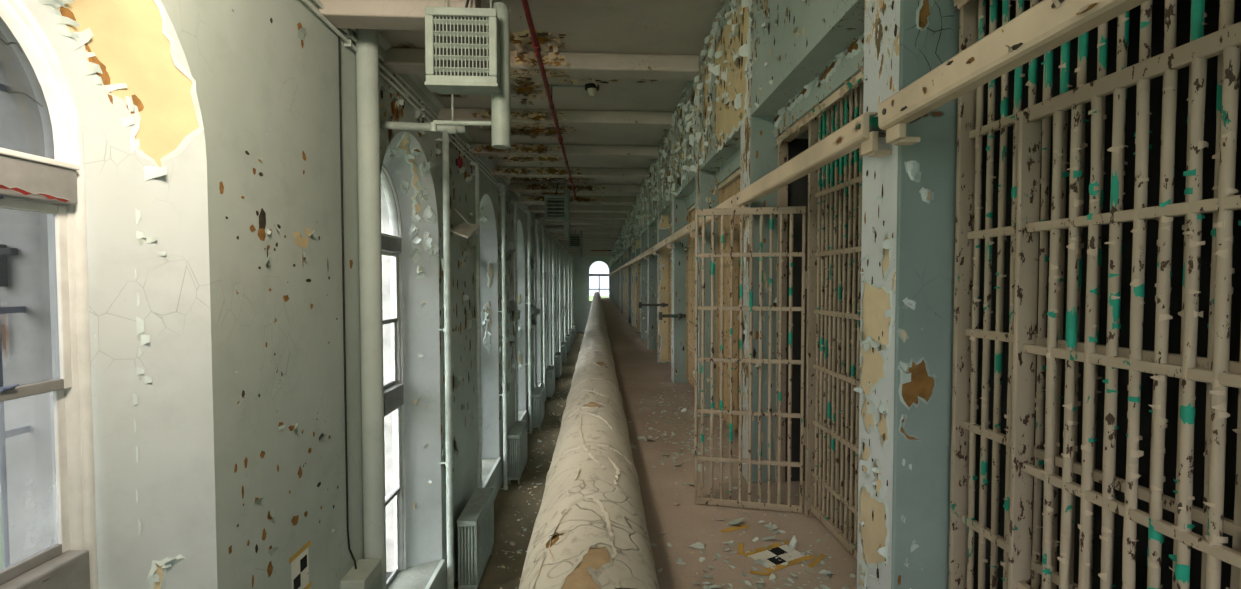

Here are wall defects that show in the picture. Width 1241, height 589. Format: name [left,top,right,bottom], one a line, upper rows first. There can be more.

flaking render [39,0,204,181]
peeling [760,33,868,147]
peeling [872,0,897,37]
crack [907,0,954,71]
peeling [379,29,618,490]
flaking render [610,0,808,461]
peeling [813,149,936,589]
peeling [147,554,187,589]
peeling [544,531,569,552]
peeling [559,545,614,589]